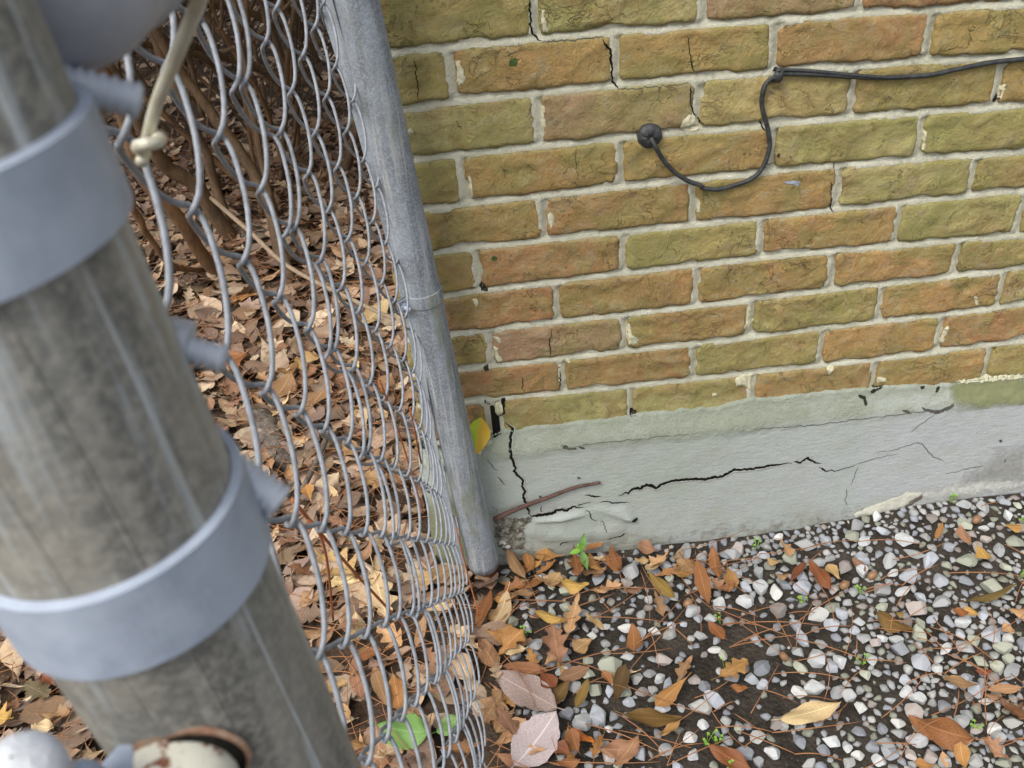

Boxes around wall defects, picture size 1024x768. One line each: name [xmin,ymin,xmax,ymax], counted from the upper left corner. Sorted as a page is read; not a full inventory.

crack [528,0,704,125]
spalling [492,516,532,551]
crack [489,410,981,540]